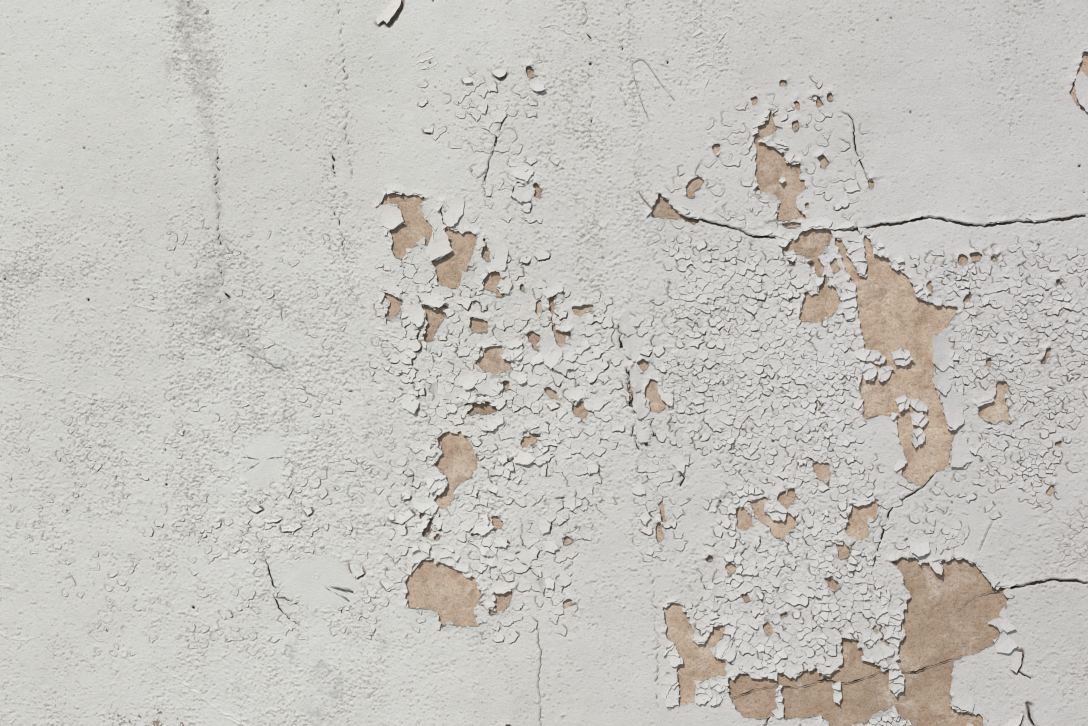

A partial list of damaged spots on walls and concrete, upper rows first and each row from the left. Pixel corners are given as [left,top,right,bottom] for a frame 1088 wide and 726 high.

peeling [376,0,401,24]
peeling [1069,46,1088,113]
crack [689,215,775,238]
crack [835,211,1088,231]
crack [617,326,656,450]
peeling [370,57,1088,726]
peeling [249,503,312,532]
crack [874,476,933,562]
crack [956,579,1088,612]
crack [535,627,543,722]
crack [731,656,959,699]